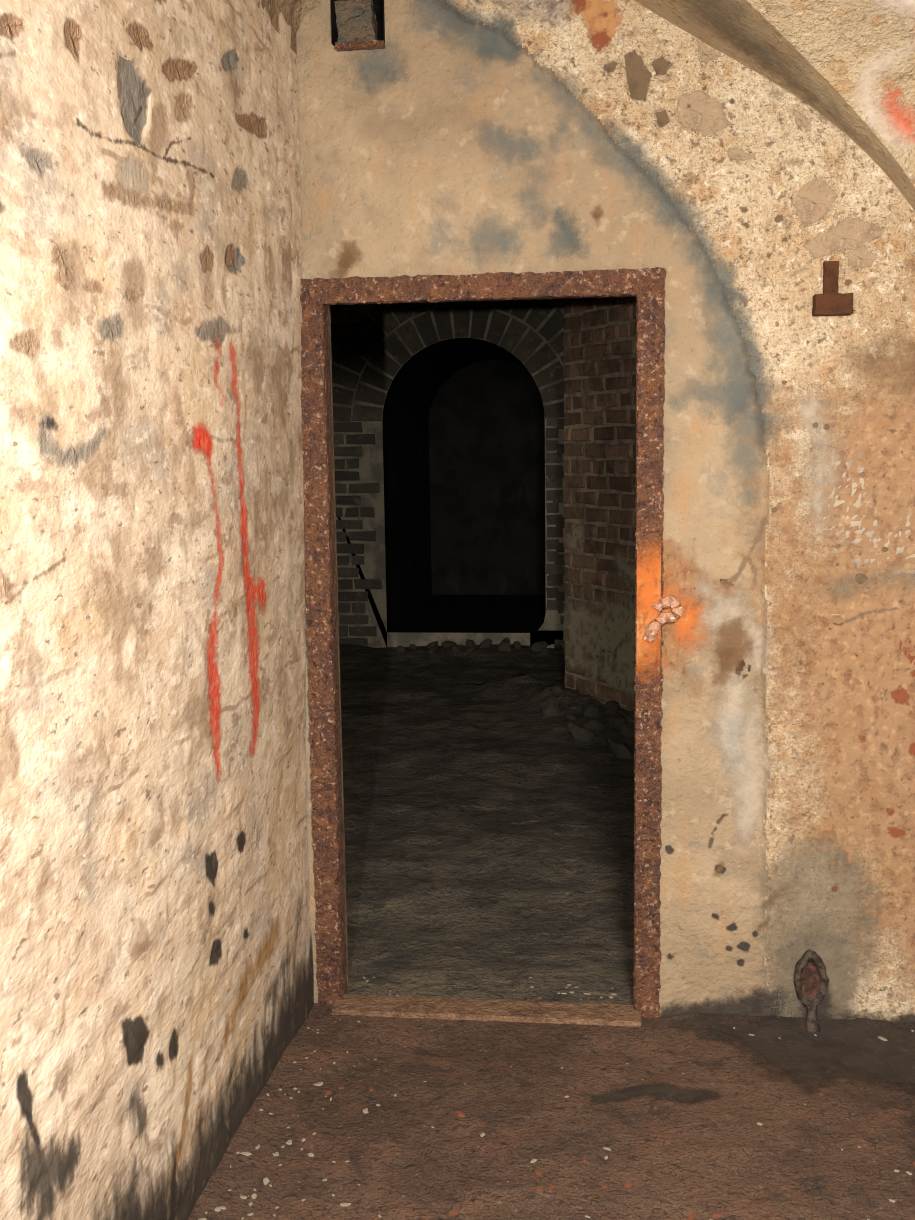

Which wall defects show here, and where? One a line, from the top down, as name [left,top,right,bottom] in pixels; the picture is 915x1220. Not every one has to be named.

leakage [418,0,517,60]
leakage [686,0,796,86]
leakage [562,88,775,499]
leakage [869,347,915,393]
leakage [801,399,915,574]
corrosion [636,545,731,673]
leakage [699,586,769,839]
leakage [661,846,915,1092]
leakage [17,1072,81,1220]
leakage [106,901,314,1220]